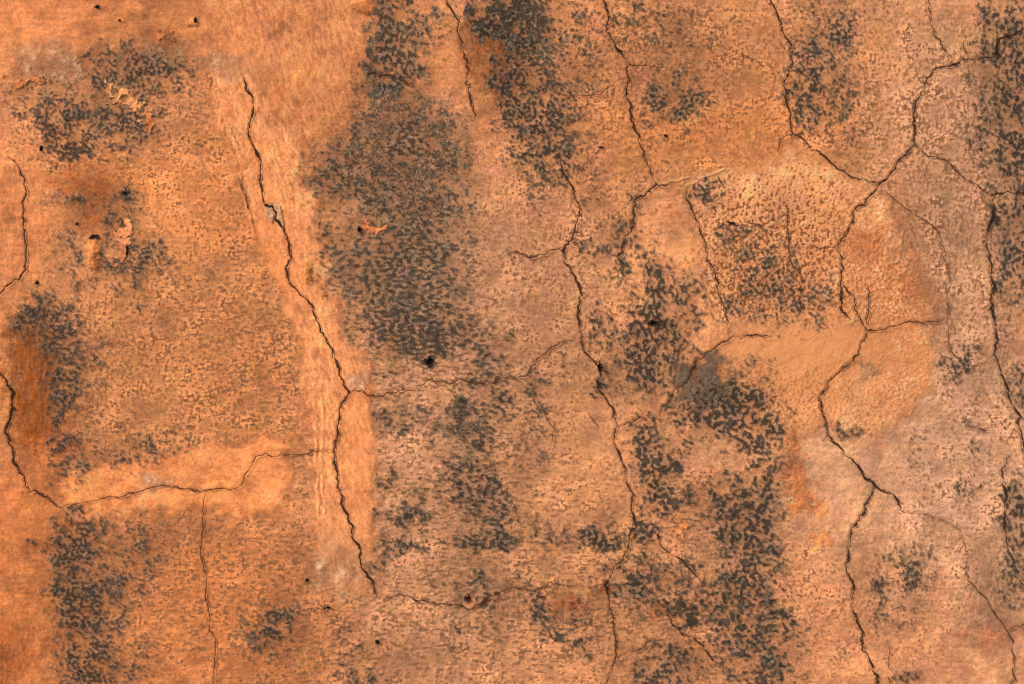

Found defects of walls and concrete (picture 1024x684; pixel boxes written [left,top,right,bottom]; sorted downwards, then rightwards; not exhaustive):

leakage [0,38,217,493]
crack [0,0,770,684]
leakage [290,0,850,684]
mould [780,0,877,165]
crack [714,0,1024,684]
leakage [964,0,1024,336]
mould [25,501,178,684]
mould [237,595,310,674]
mould [860,544,936,633]
mould [891,671,922,684]